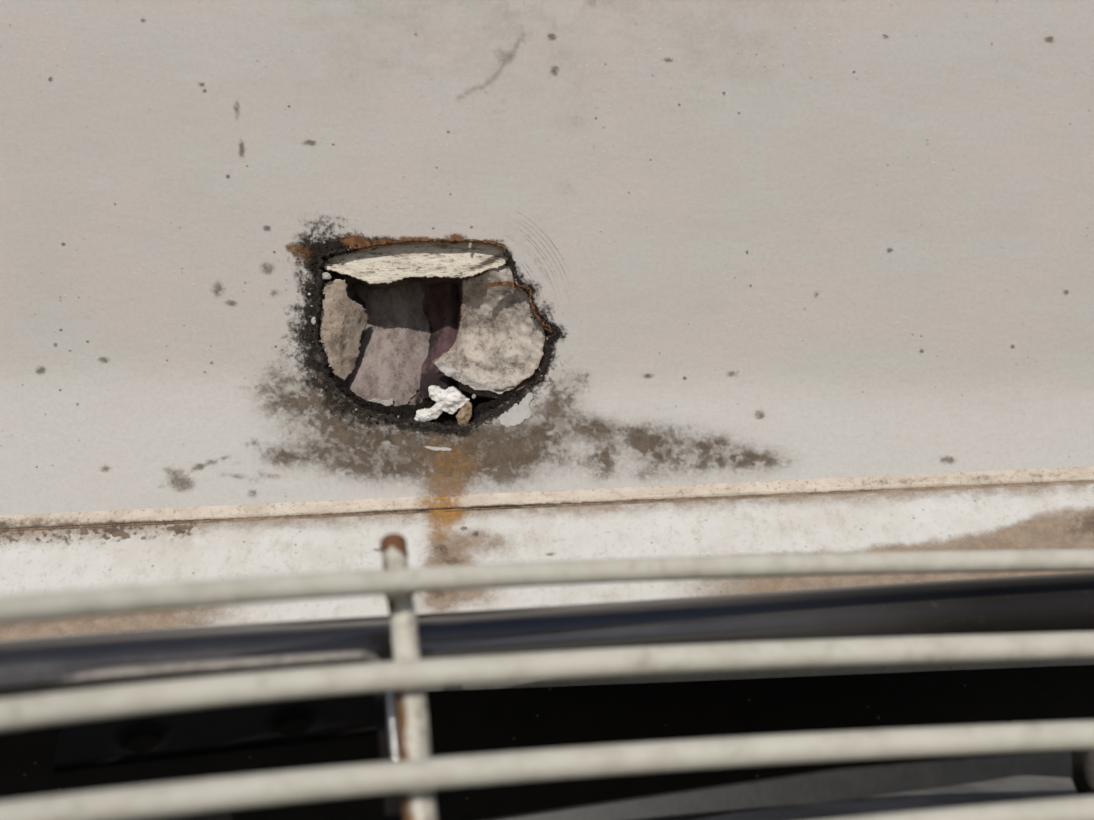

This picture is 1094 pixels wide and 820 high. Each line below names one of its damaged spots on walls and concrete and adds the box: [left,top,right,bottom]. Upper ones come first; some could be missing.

corrosion [286,243,308,258]
corrosion [341,235,432,248]
water stain [275,356,613,481]
peeling [499,393,533,427]
water stain [626,428,682,464]
water stain [696,440,774,468]
corrosion [423,448,474,537]